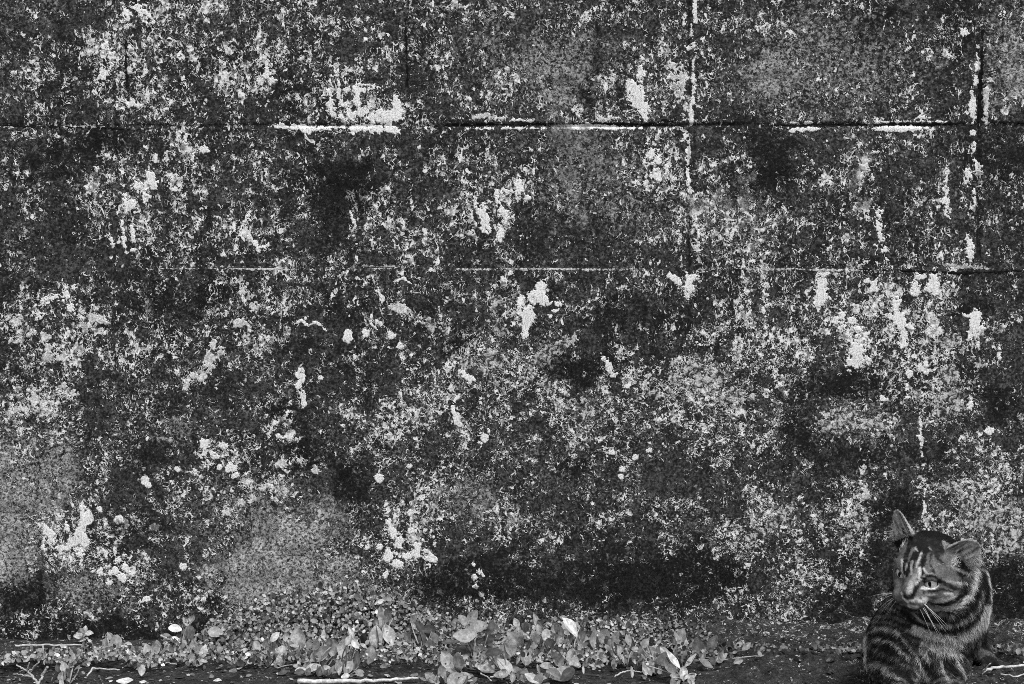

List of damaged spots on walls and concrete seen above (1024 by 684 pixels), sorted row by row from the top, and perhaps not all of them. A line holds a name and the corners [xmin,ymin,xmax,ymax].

leakage [311,149,387,246]
leakage [0,440,80,586]